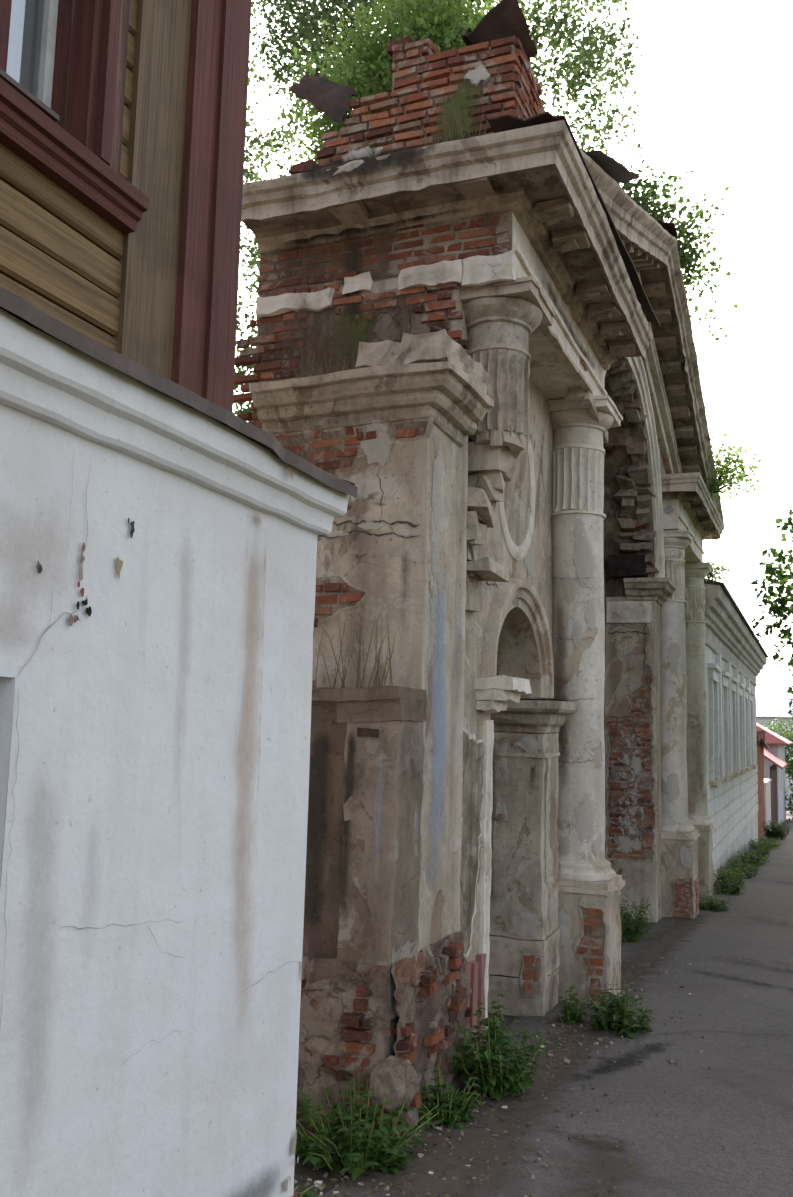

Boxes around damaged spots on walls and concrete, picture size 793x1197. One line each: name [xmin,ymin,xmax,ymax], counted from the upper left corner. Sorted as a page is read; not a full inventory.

spalling [233,210,516,477]
spalling [328,494,384,537]
crack [317,465,420,539]
spalling [68,543,92,626]
spalling [314,573,370,627]
spalling [605,664,658,866]
spalling [671,875,699,918]
spalling [572,903,610,1005]